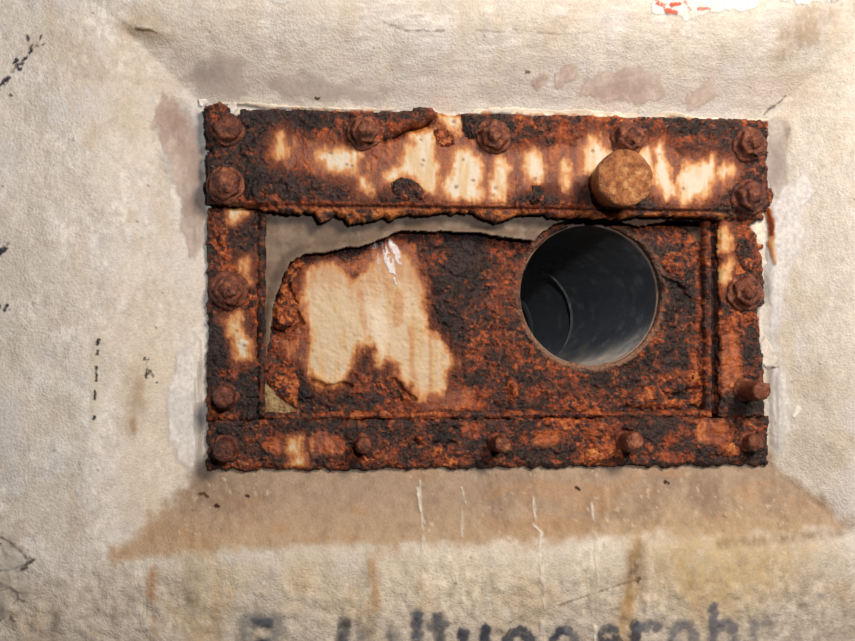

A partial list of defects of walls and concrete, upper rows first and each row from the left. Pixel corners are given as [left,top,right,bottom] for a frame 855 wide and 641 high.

peeling [652,0,759,21]
corrosion [205,101,228,138]
corrosion [433,113,483,147]
corrosion [390,177,425,201]
corrosion [529,185,546,205]
corrosion [661,254,686,278]
corrosion [734,234,758,273]
corrosion [272,258,304,330]
corrosion [265,363,300,407]
corrosion [615,342,704,410]
corrosion [583,443,616,464]